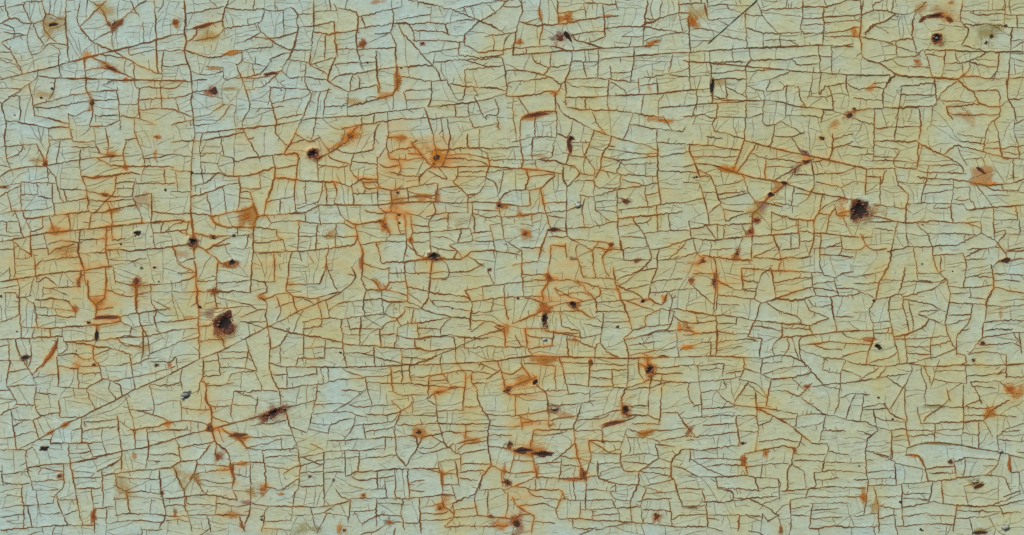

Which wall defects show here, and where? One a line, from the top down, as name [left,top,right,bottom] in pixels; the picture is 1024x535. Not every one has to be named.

rust [430,150,446,167]
rust [232,204,259,237]
crack [985,453,1024,501]
crack [196,514,218,535]
rust [488,512,523,535]
crack [786,498,805,534]